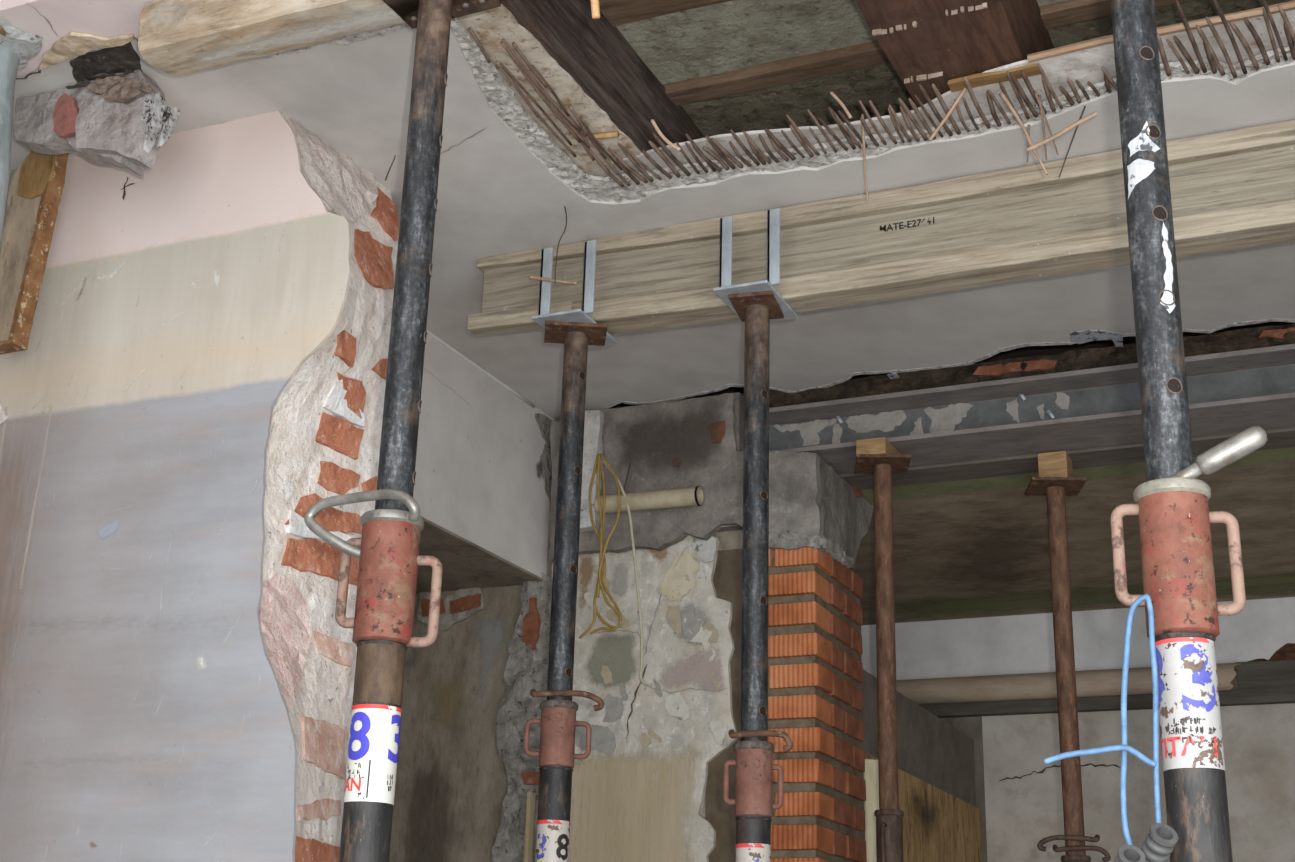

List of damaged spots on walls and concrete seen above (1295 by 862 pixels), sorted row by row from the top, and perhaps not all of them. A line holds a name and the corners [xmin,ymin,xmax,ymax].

flaking render [1157,0,1295,84]
spalling [14,32,181,177]
flaking render [450,4,1117,203]
flaking render [287,118,399,290]
flaking render [769,330,1138,408]
flaking render [1182,319,1295,357]
peeling [774,397,1020,447]
flaking render [259,330,388,780]
peeling [691,537,717,563]
flaking render [492,572,553,862]
peeling [575,666,628,758]
flaking render [294,799,341,862]